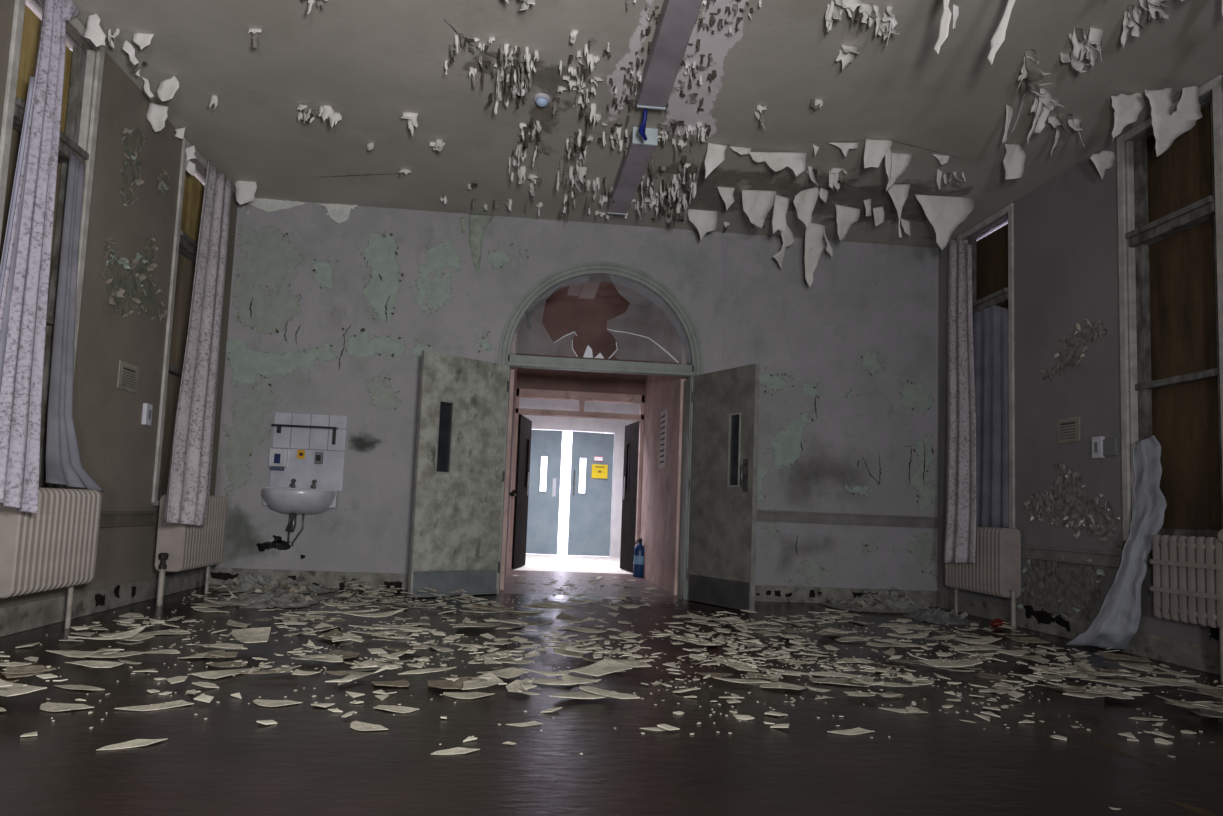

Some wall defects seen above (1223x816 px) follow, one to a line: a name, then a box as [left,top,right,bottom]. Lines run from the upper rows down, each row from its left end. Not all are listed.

peeling [301,0,328,15]
peeling [248,28,262,49]
peeling [987,0,1016,65]
peeling [1060,27,1104,73]
peeling [401,112,418,136]
peeling [430,139,445,151]
peeling [1002,49,1203,180]
peeling [232,180,357,335]
peeling [360,230,404,322]
damp [352,438,376,450]